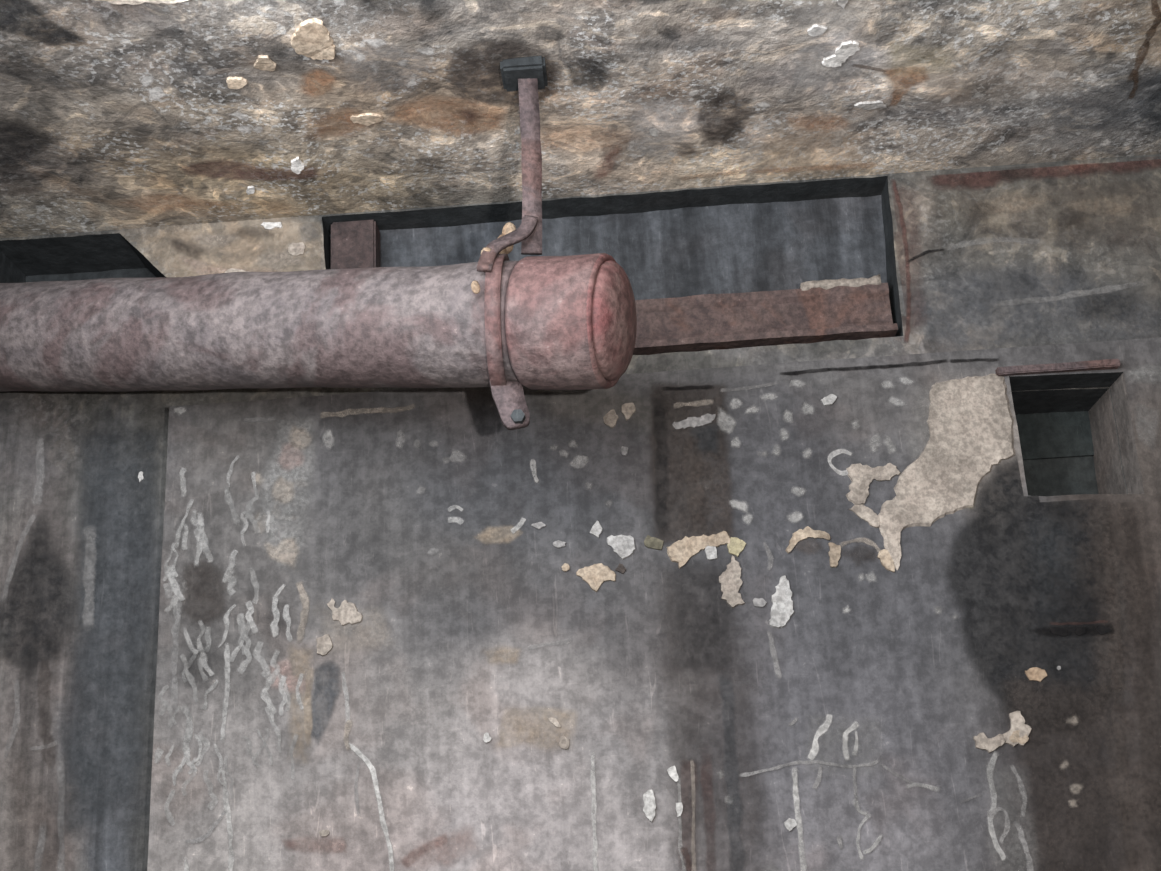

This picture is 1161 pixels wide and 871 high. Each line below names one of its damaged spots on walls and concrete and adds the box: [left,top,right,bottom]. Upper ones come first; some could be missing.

crack [1129,0,1161,98]
damp [143,76,165,99]
damp [232,112,261,132]
spalling [718,394,775,446]
spalling [762,394,837,455]
flaking render [785,373,1016,572]
flaking render [504,518,546,540]
spalling [732,501,751,523]
flaking render [562,521,794,676]
flaking render [973,711,1032,753]